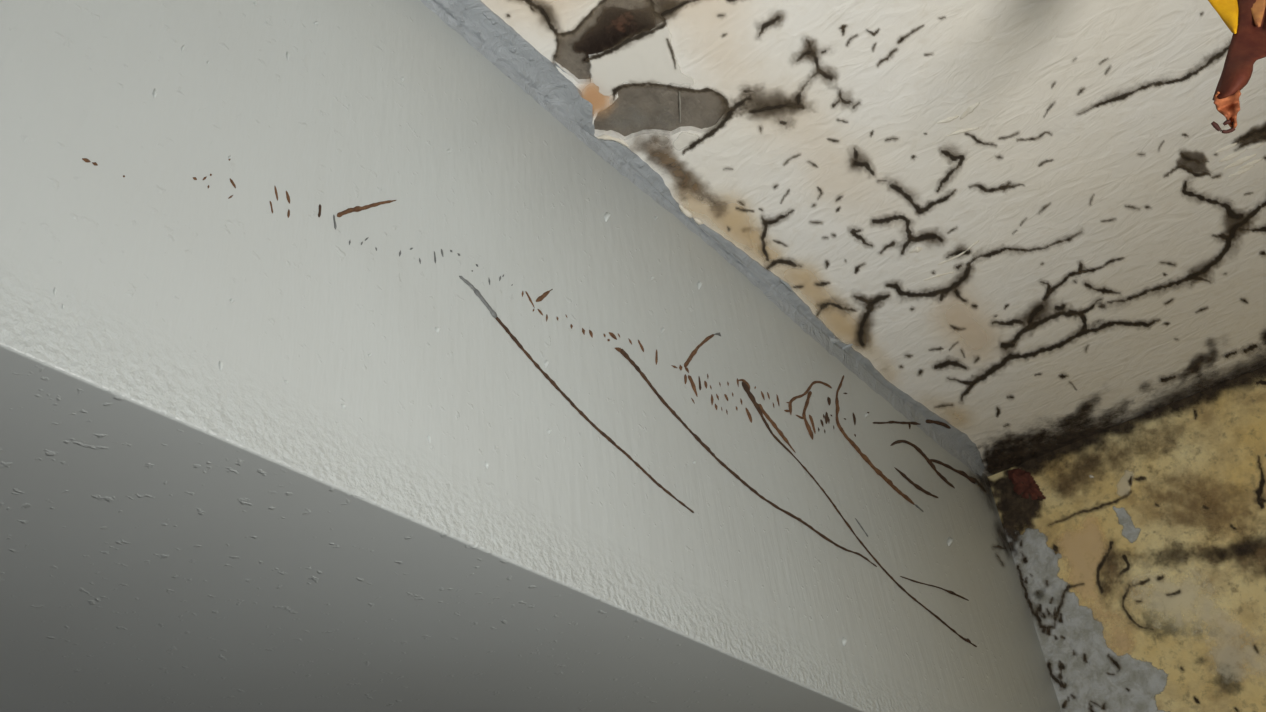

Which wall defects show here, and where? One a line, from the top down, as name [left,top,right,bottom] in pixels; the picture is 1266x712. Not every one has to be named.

crack [507,0,559,64]
flaking render [555,0,730,150]
crack [660,0,737,37]
leakage [641,136,745,236]
crack [683,16,1266,427]
leakage [795,273,858,340]
leakage [969,331,1266,566]
peeling [1004,518,1168,712]
leakage [1097,541,1154,630]
leakage [1202,538,1266,575]